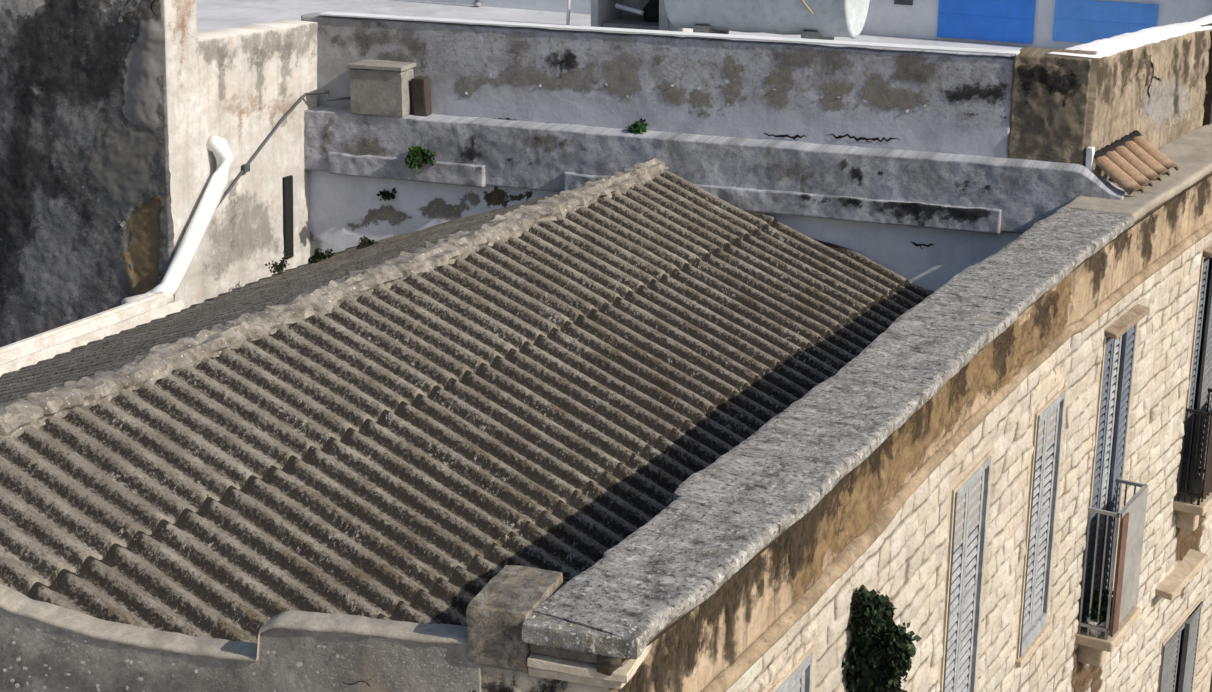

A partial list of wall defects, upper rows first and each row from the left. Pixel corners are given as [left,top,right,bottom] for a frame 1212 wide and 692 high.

peeling [455,51,643,102]
peeling [657,56,747,108]
peeling [763,67,794,110]
peeling [819,72,930,113]
crack [763,133,899,143]
water stain [0,0,136,328]
flaking render [88,112,166,296]
water stain [947,363,969,410]
water stain [620,398,933,692]